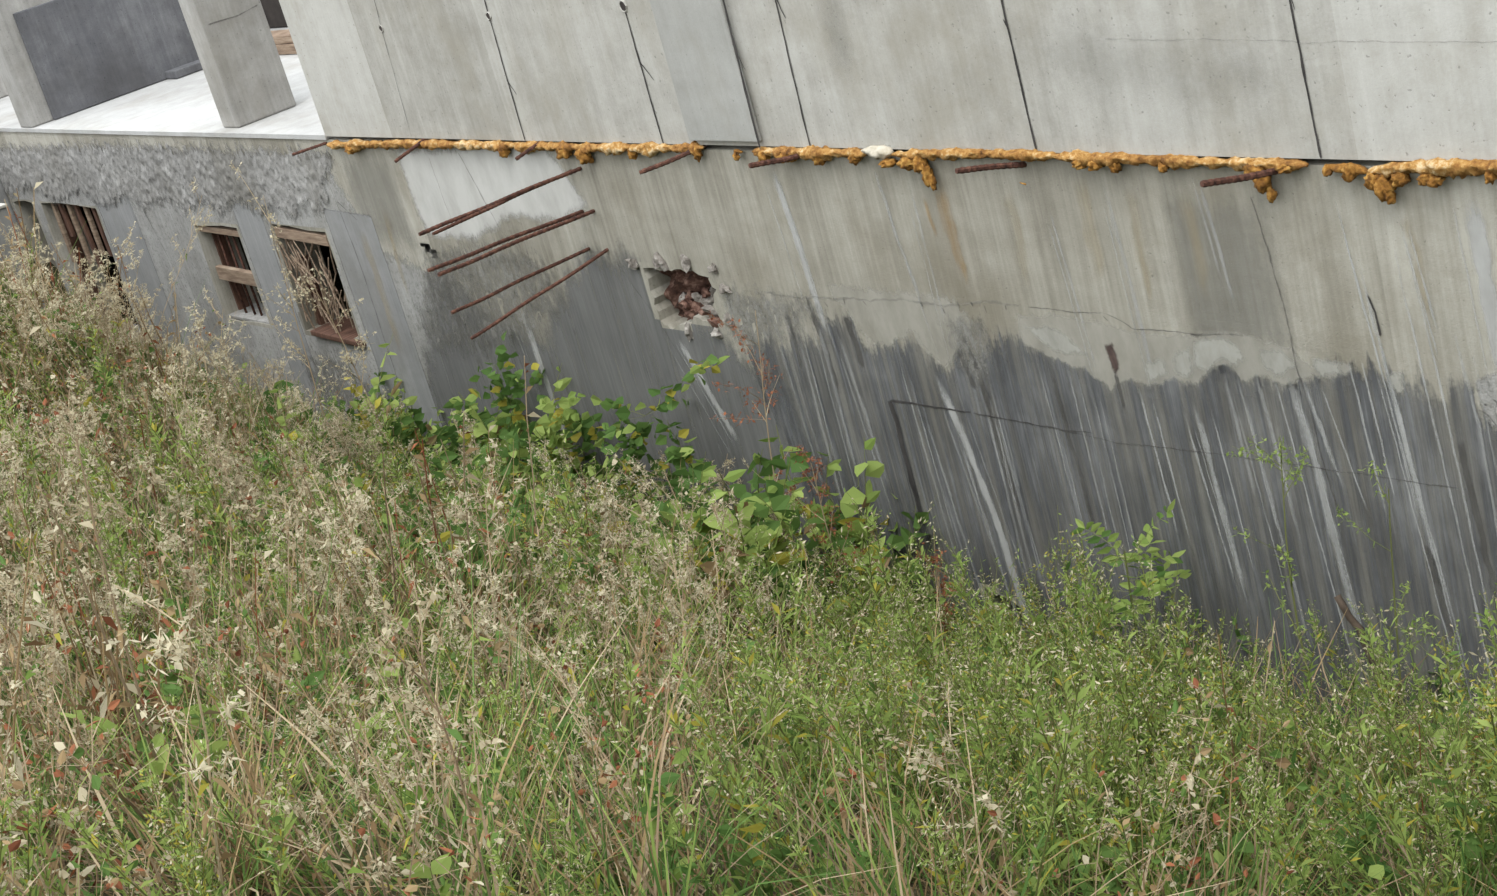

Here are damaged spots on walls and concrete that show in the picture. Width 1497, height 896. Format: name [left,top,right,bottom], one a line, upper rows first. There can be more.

spalling [418,167,582,236]
spalling [427,209,595,277]
spalling [450,247,609,340]
spalling [625,252,734,342]
crack [888,205,1337,512]
crack [1368,296,1381,336]
leakage [426,179,1497,753]